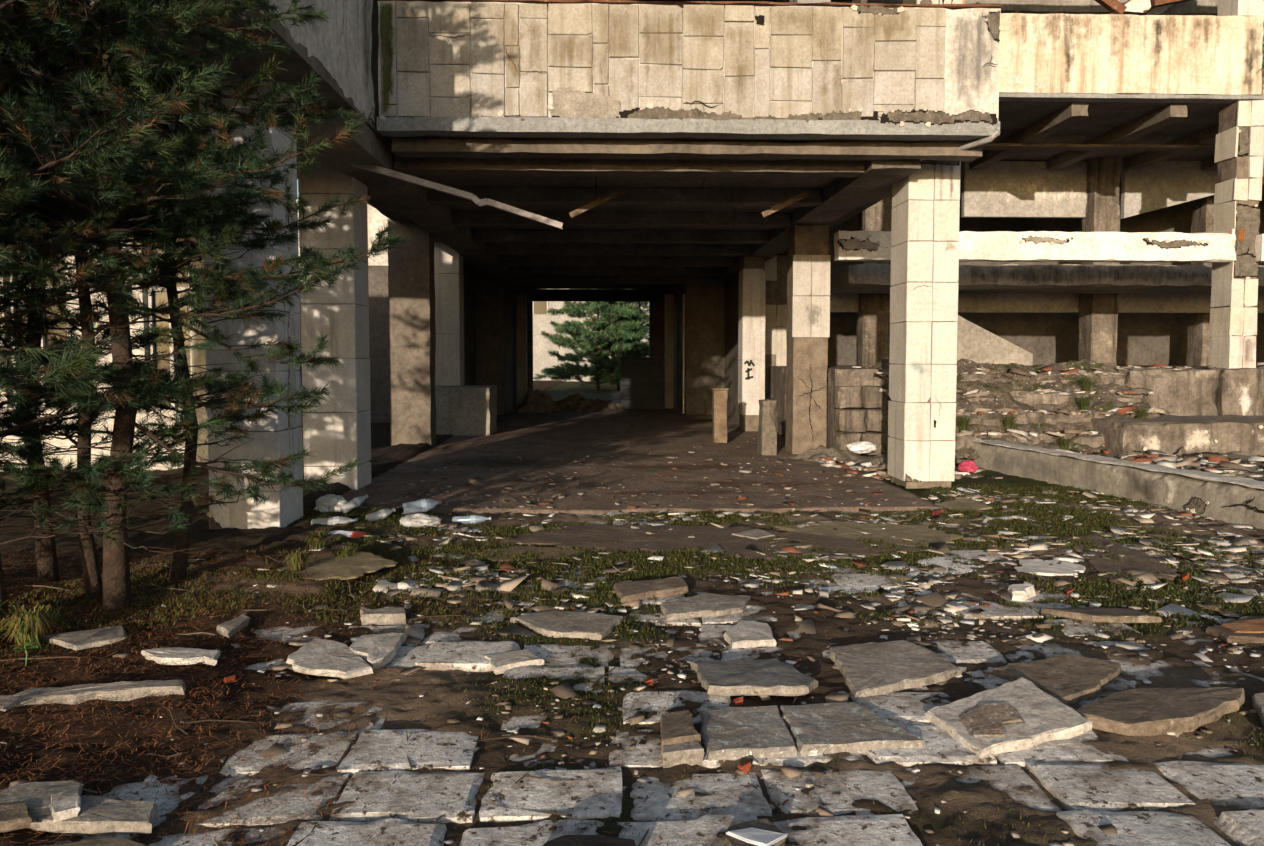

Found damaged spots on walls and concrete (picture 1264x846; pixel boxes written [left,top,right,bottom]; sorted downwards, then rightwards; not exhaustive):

spalling [548,86,998,128]
peeling [837,237,888,252]
peeling [1019,235,1073,245]
peeling [1142,238,1211,249]
spalling [1234,203,1261,280]
crack [795,365,824,436]
crack [1222,496,1264,513]